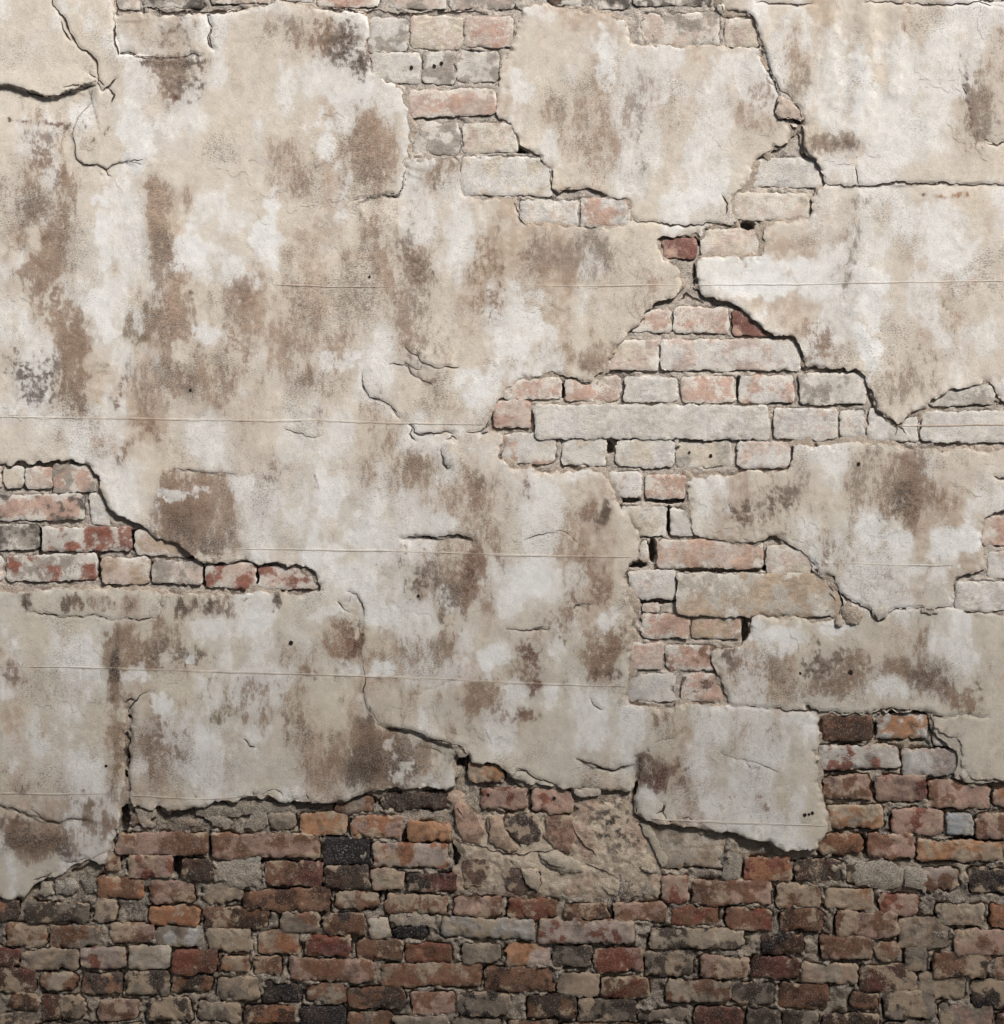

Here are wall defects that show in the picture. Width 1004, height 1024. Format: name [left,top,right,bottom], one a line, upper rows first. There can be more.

crack [1,0,246,176]
crack [319,6,483,16]
water stain [0,1,676,873]
crack [391,347,459,384]
crack [362,373,489,469]
spalling [114,0,1004,711]
spalling [0,459,324,596]
crack [339,593,467,754]
water stain [632,441,1004,775]
spalling [0,708,1004,1024]